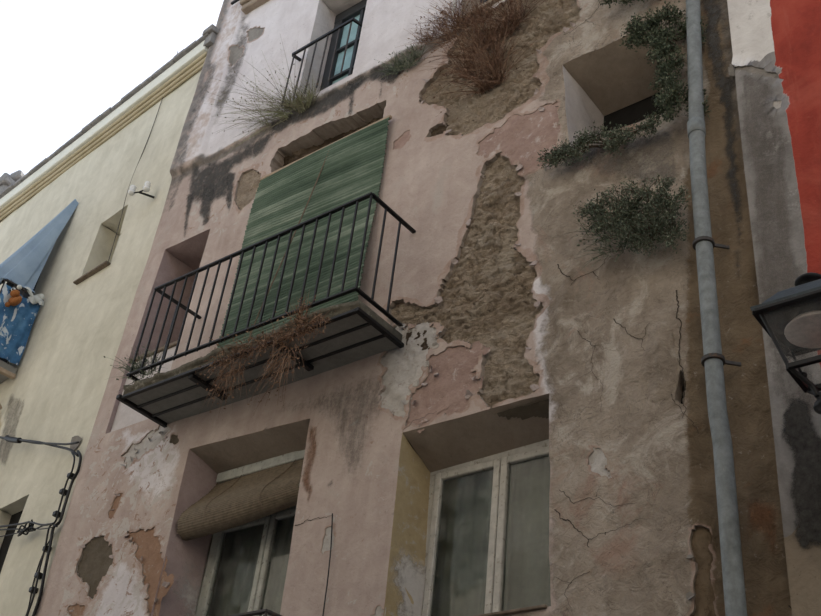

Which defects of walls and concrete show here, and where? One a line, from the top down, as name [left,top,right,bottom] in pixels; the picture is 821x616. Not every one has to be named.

flaking render [229,27,264,65]
damp [184,61,405,229]
damp [701,0,741,235]
flaking render [381,0,581,433]
crack [663,290,698,431]
flaking render [120,426,179,468]
damp [783,391,821,549]
crack [554,485,649,547]
flaking render [68,536,114,616]
flaking render [124,528,174,616]
flaking render [395,555,426,616]
flaking render [686,527,716,616]